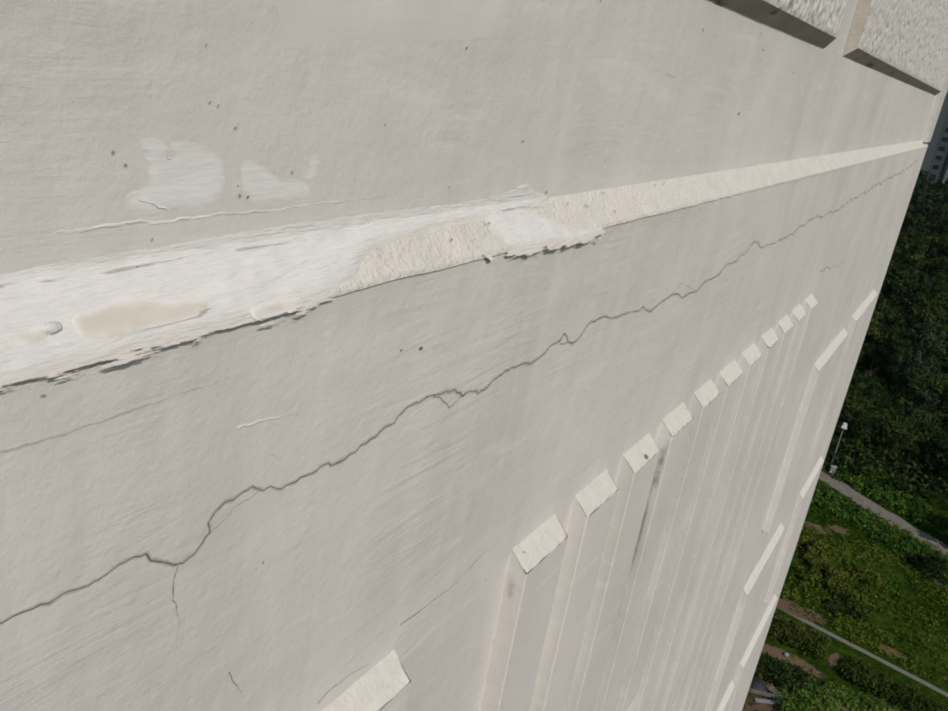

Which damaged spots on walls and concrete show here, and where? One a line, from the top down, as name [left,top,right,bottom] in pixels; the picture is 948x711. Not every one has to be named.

peeling [72,297,209,341]
peeling [249,298,304,321]
crack [0,242,754,624]